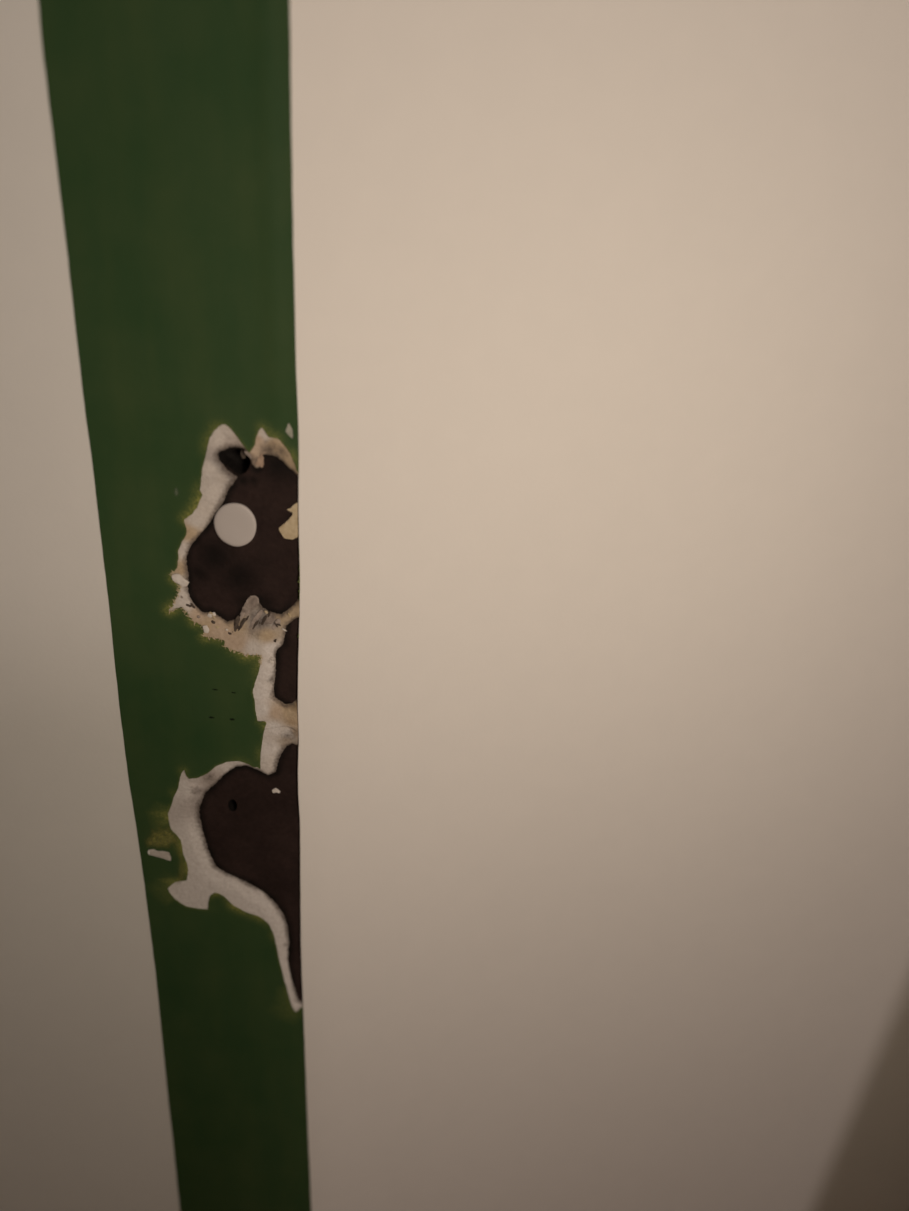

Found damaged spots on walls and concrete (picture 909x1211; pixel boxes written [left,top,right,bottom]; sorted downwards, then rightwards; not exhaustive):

peeling [279,502,298,540]
peeling [148,830,183,878]